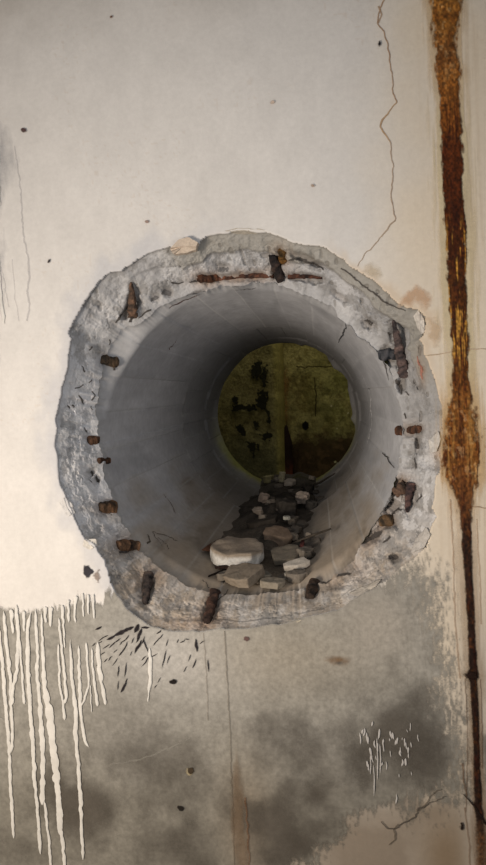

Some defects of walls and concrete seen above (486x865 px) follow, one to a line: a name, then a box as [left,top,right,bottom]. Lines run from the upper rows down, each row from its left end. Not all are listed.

crack [358,0,397,265]
peeling [0,228,474,865]
rust [427,0,486,865]
damp [0,593,107,865]
damp [359,721,419,791]